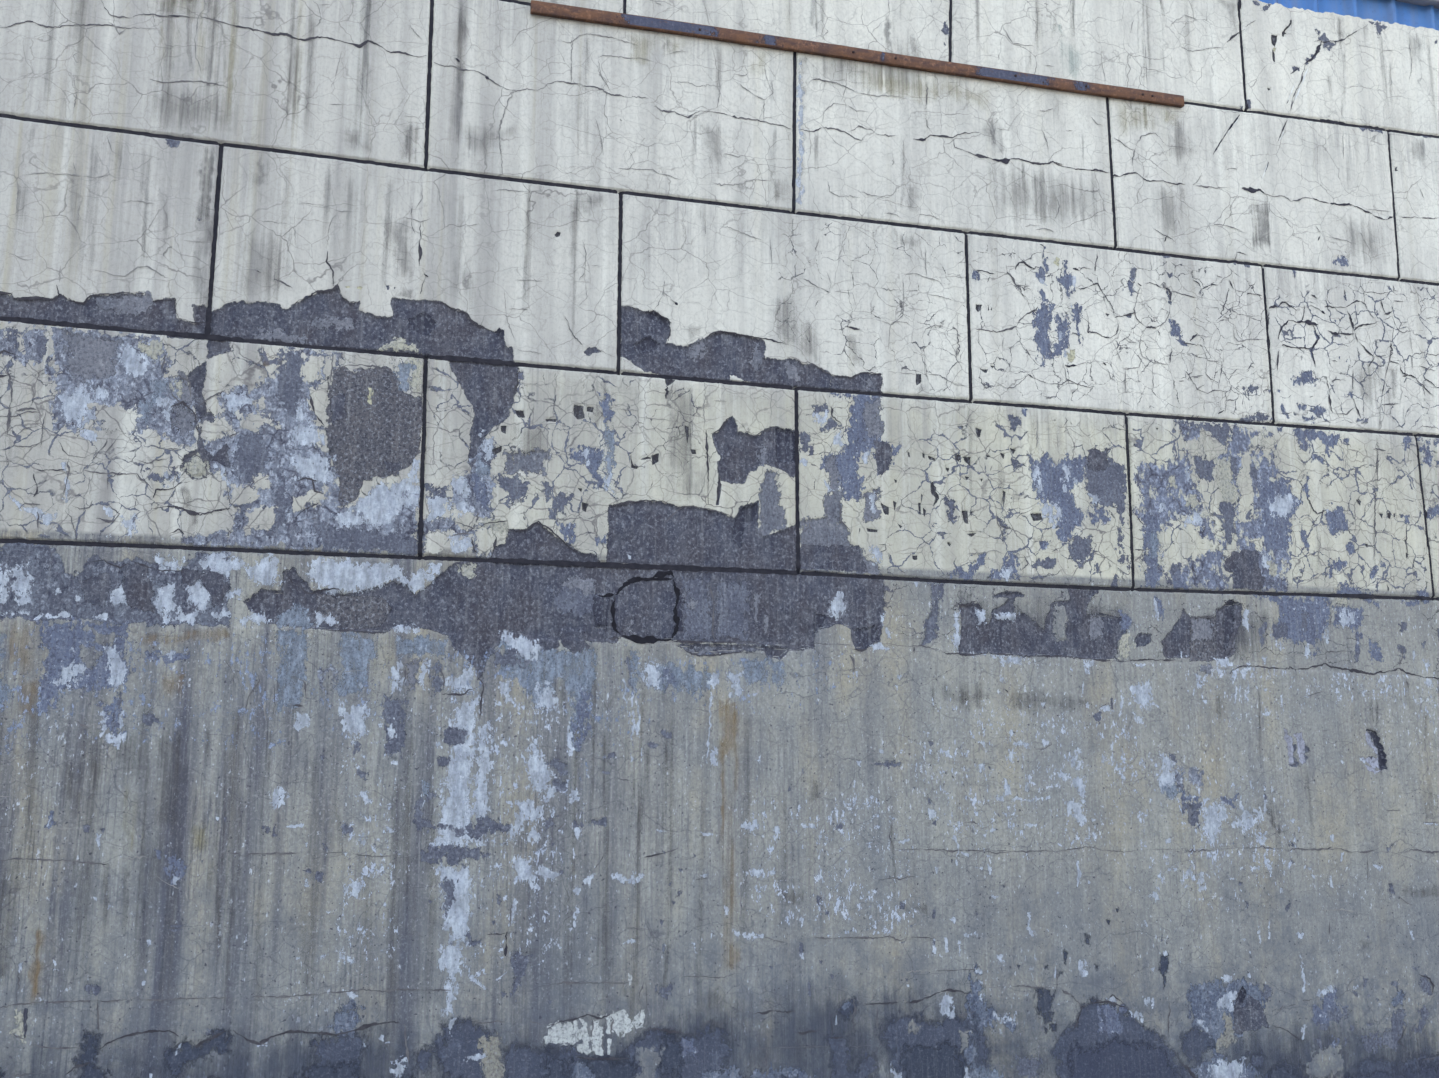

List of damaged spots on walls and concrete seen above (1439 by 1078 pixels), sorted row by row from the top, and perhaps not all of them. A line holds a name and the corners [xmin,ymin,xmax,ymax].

crack [0,0,1439,746]
spalling [0,284,1439,792]
water stain [950,635,1029,683]
water stain [1180,626,1439,728]
water stain [879,659,1304,954]
crack [766,784,1439,943]
spalling [448,894,541,1002]
peeling [543,1009,647,1056]
water stain [1050,996,1196,1078]
peeling [1180,976,1273,1078]
water stain [1262,1024,1439,1078]
peeling [1311,966,1435,1054]